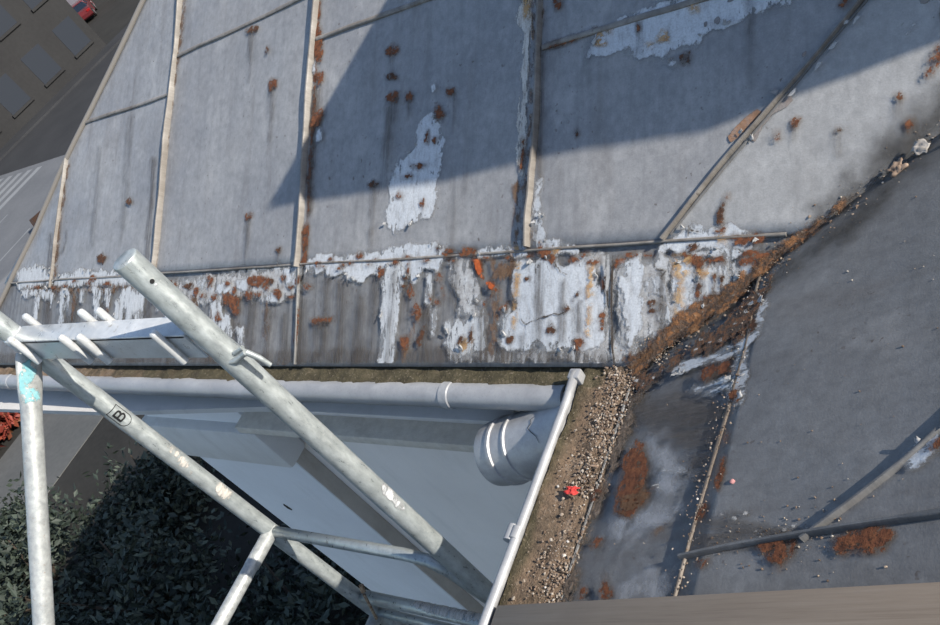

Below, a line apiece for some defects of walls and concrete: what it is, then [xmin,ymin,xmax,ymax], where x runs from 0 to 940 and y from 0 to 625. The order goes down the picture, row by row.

corrosion [25,164,135,320]
peeling [16,263,166,324]
corrosion [170,273,311,341]
corrosion [300,1,325,267]
peeling [382,111,446,234]
peeling [172,176,764,363]
corrosion [442,179,533,354]
peeling [515,0,532,177]
peeling [585,0,792,60]
peeling [669,294,769,406]
corrosion [716,196,728,224]
water stain [870,107,940,182]